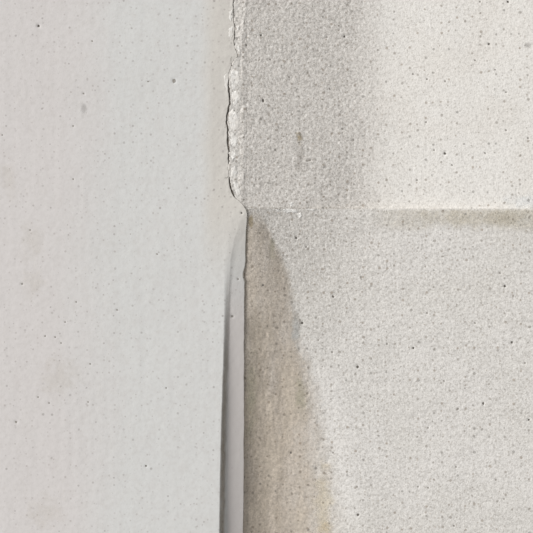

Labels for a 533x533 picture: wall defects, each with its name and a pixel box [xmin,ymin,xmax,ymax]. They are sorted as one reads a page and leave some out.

crack [224,81,232,164]
crack [240,248,248,337]
leakage [243,231,315,533]